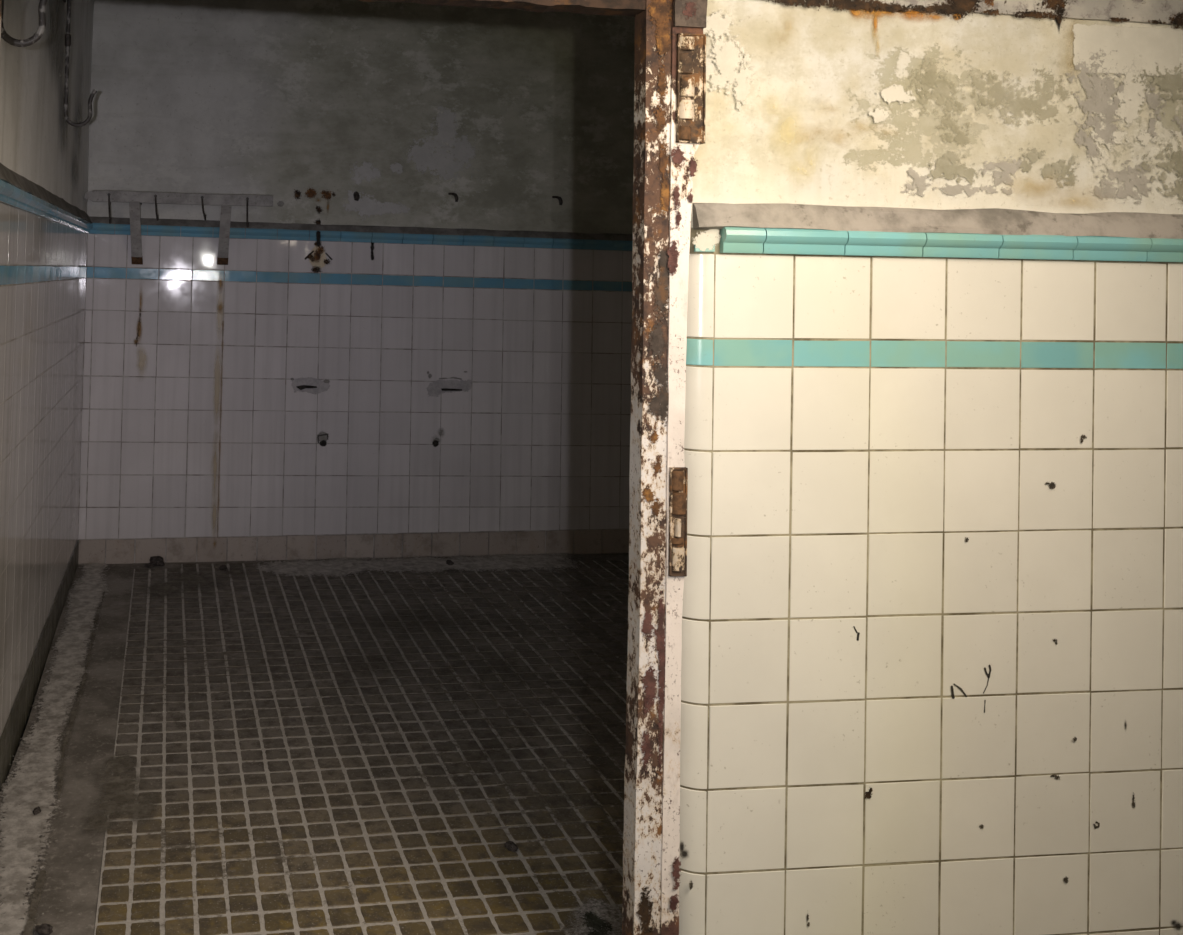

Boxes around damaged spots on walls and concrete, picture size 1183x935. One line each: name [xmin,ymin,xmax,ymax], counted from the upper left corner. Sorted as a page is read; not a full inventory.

rust [764,0,1071,34]
rust [1148,12,1183,30]
peeling [869,49,1183,210]
rust [277,188,336,225]
rust [305,242,332,273]
rust [134,295,145,369]
rust [642,488,662,516]
rust [640,573,666,775]
rust [636,854,681,935]